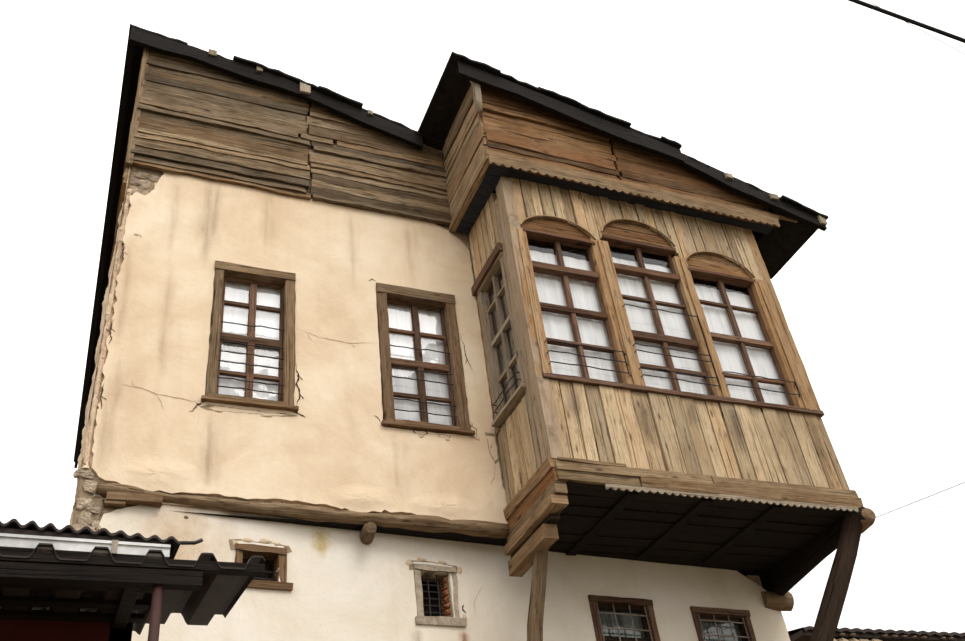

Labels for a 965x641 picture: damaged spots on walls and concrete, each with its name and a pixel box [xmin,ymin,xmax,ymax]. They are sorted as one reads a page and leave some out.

flaking render [126,166,162,195]
crack [100,381,205,411]
flaking render [71,461,104,531]